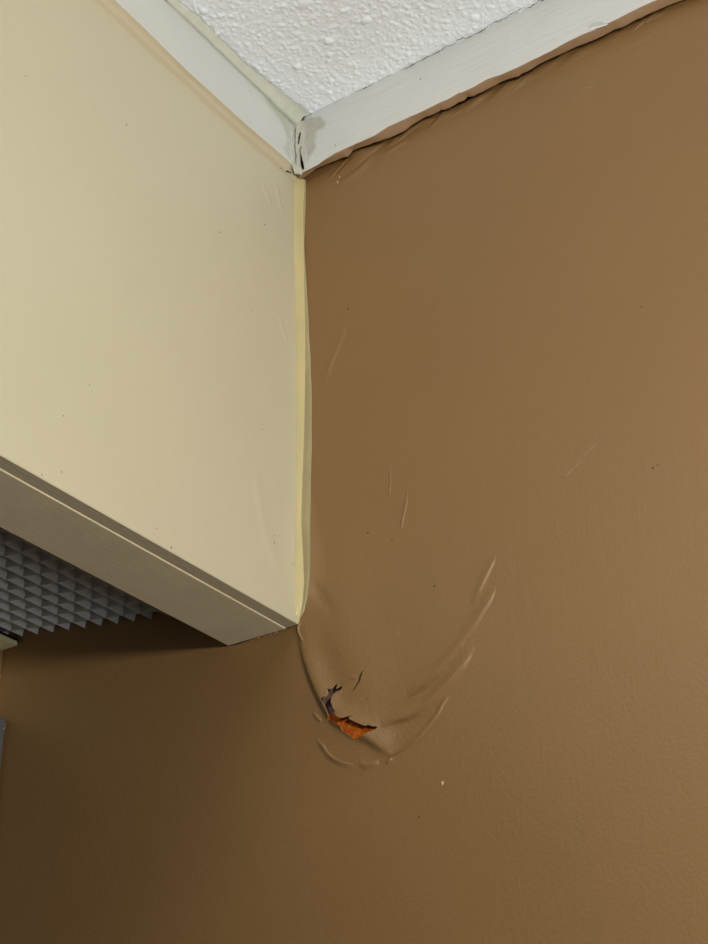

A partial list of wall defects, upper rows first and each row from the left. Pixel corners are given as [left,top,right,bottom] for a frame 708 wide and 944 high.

peeling [320,684,377,739]